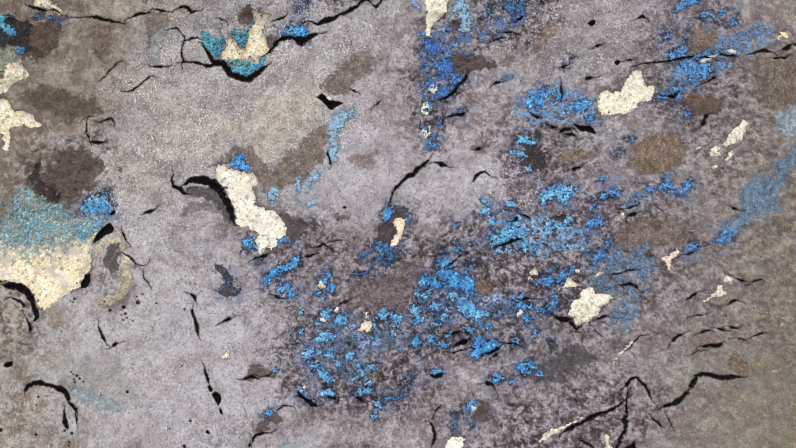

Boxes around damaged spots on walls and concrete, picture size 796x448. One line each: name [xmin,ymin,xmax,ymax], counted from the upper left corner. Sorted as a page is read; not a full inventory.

spalling [0,46,42,151]
crack [28,0,382,92]
spalling [201,10,270,77]
spalling [524,0,766,124]
spalling [0,187,114,310]
crack [171,174,235,225]
spalling [215,151,292,259]
crack [389,155,454,203]
crack [0,281,39,333]
spalling [293,169,694,421]
crack [24,380,78,429]
crack [559,372,749,448]